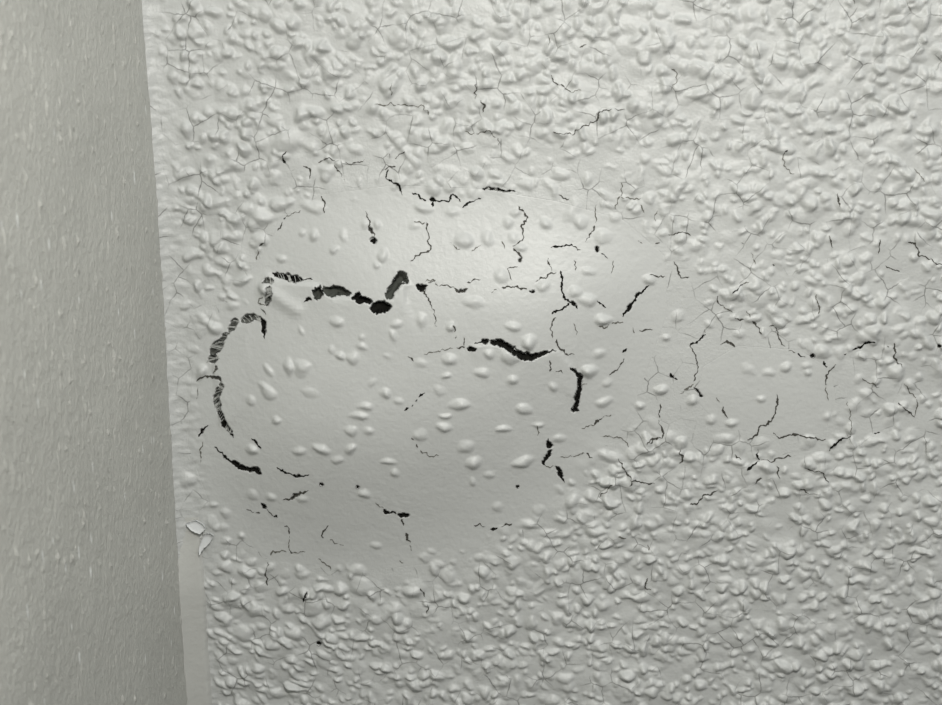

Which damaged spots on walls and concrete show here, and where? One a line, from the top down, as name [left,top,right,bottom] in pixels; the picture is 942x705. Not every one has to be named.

crack [197,151,691,586]
crack [670,253,918,494]
crack [908,242,942,265]